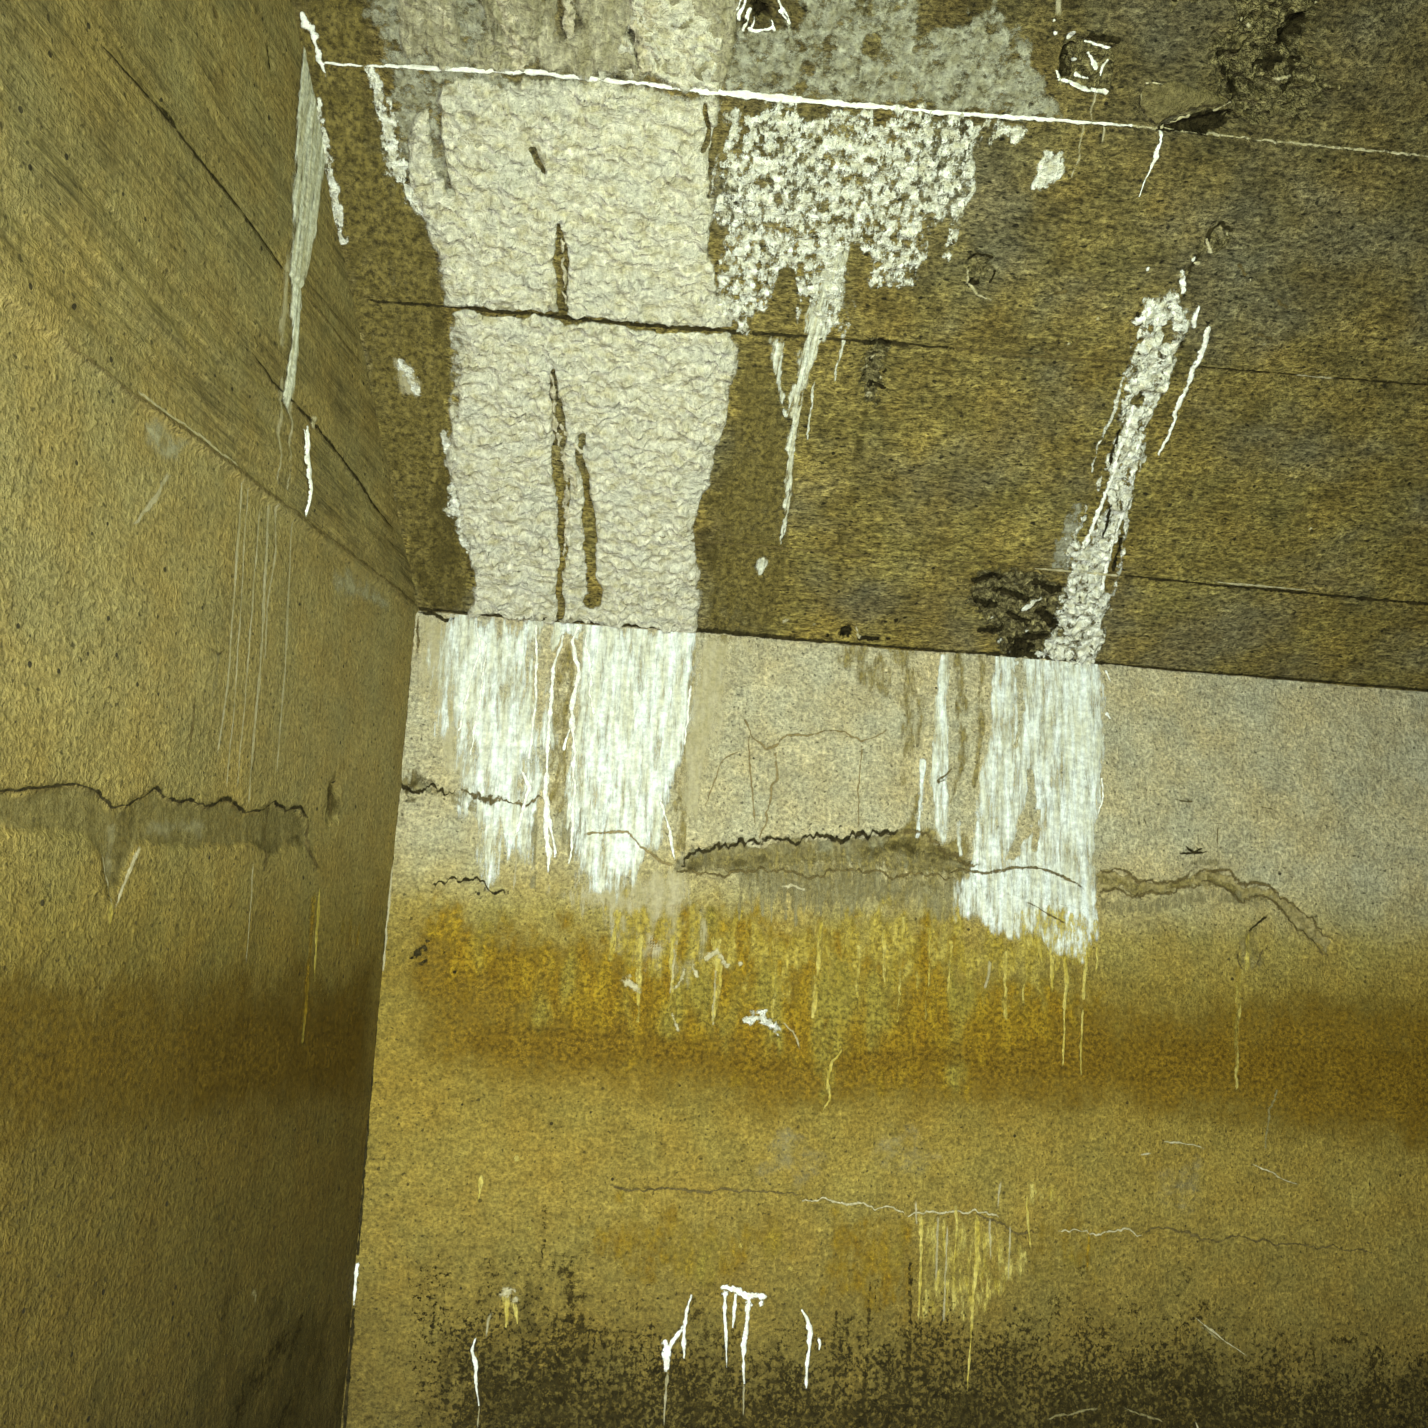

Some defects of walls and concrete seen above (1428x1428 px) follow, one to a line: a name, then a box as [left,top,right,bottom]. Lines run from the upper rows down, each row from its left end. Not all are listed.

spalling [1140,0,1341,135]
damp [218,485,292,799]
damp [277,0,1428,1146]
spalling [966,567,1069,659]
crack [696,628,1428,692]
crack [0,783,319,902]
crack [64,337,656,1428]
crack [949,828,1332,956]
corrosion [427,887,1099,1108]
corrosion [1235,916,1267,1089]
damp [394,1181,1428,1428]